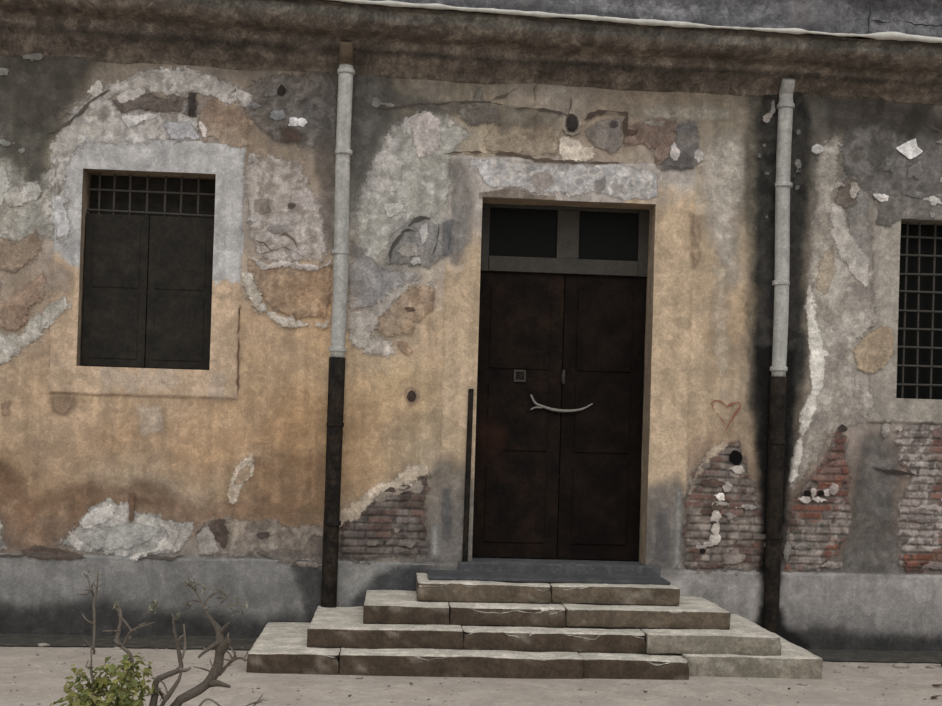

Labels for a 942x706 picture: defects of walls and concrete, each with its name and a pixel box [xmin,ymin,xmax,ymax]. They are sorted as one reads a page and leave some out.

peeling [0,65,338,329]
peeling [346,86,558,359]
crack [379,82,572,116]
peeling [468,105,747,375]
leakage [745,94,779,628]
leakage [781,92,942,541]
peeling [783,103,942,574]
crack [868,5,942,32]
leakage [0,560,322,638]
peeling [60,493,323,568]
spalling [681,441,766,575]
leakage [778,610,942,651]